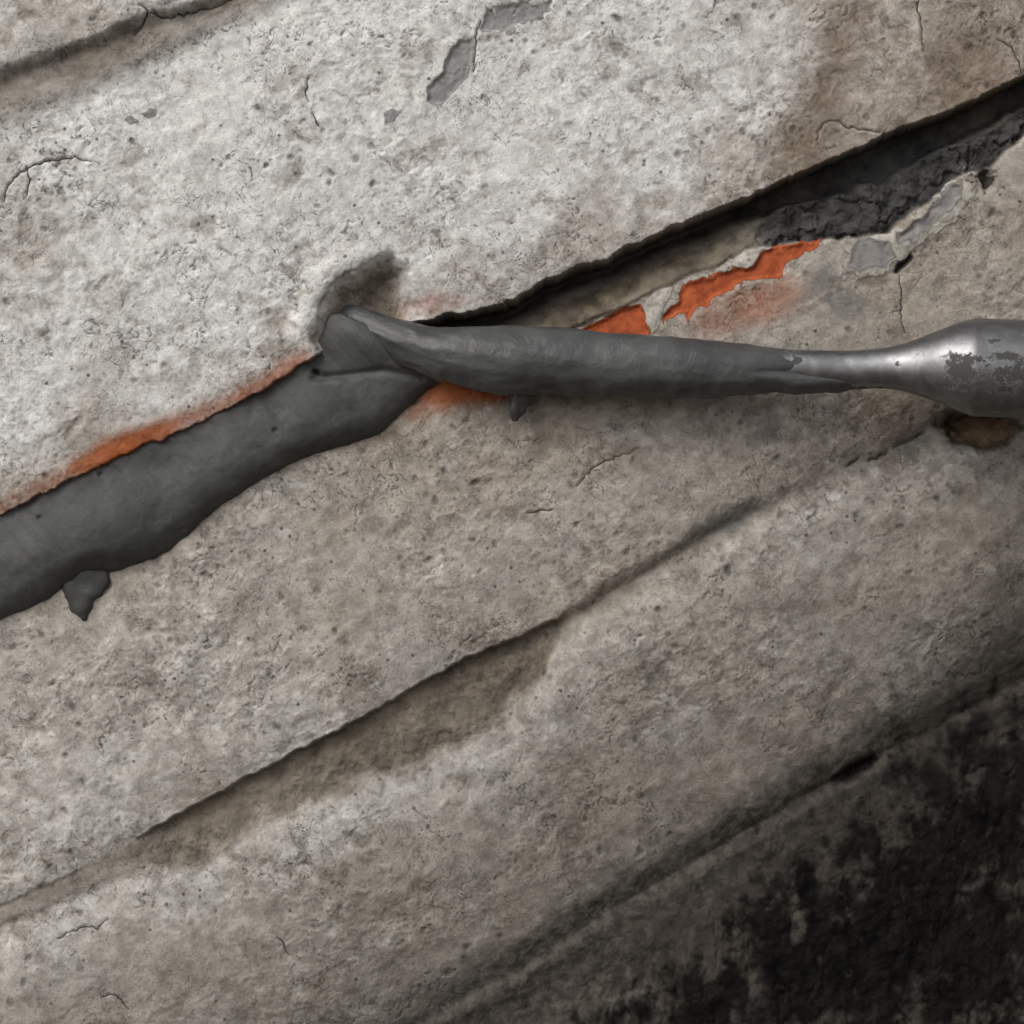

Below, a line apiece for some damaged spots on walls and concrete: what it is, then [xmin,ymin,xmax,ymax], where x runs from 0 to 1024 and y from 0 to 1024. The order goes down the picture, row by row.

peeling [426,0,552,105]
peeling [384,109,400,123]
crack [816,120,880,141]
spalling [842,167,1001,281]
spalling [583,238,821,335]
crack [898,274,906,332]
water stain [596,613,1024,1024]